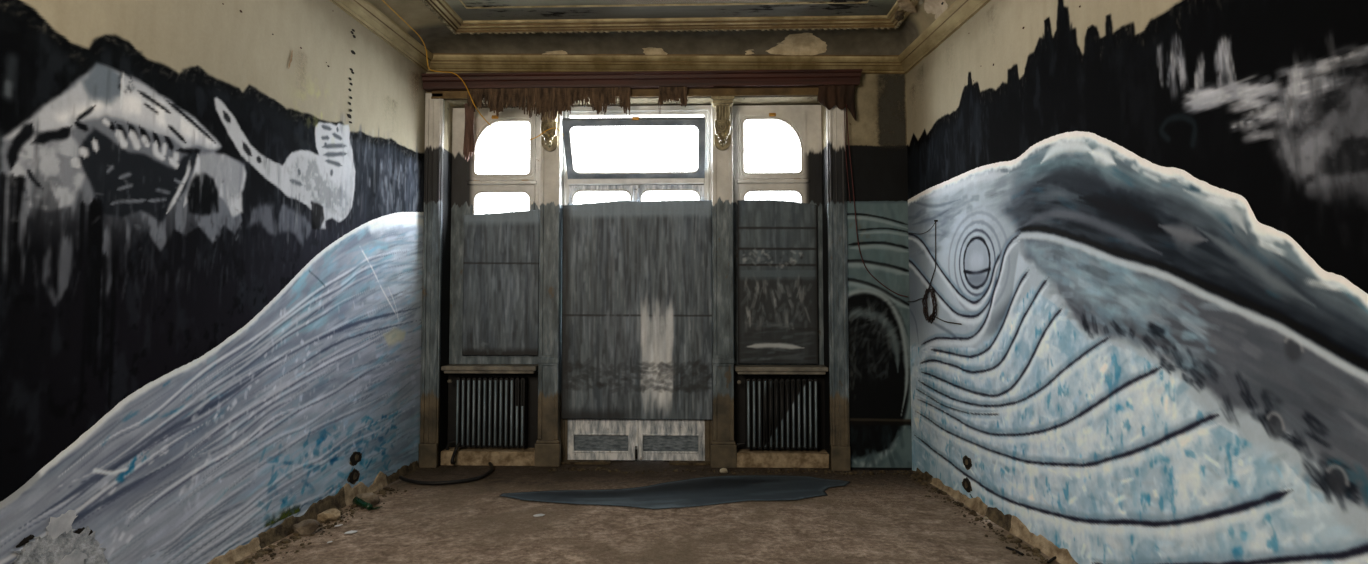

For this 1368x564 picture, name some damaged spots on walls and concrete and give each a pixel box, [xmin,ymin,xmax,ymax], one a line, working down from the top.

spalling [10,510,108,564]
flaking render [207,451,420,564]